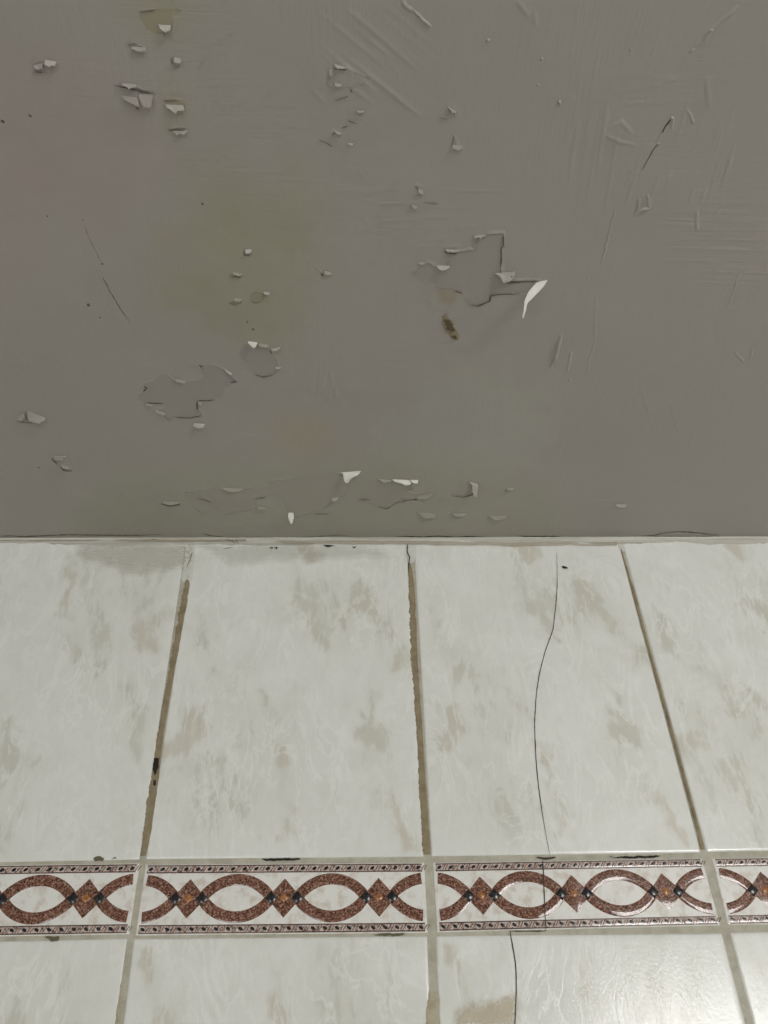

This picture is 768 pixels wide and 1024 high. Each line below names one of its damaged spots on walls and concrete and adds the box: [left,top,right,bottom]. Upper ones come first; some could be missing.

peeling [137,6,182,35]
peeling [111,83,189,136]
peeling [409,229,547,318]
peeling [357,478,436,520]
crack [510,581,558,1024]